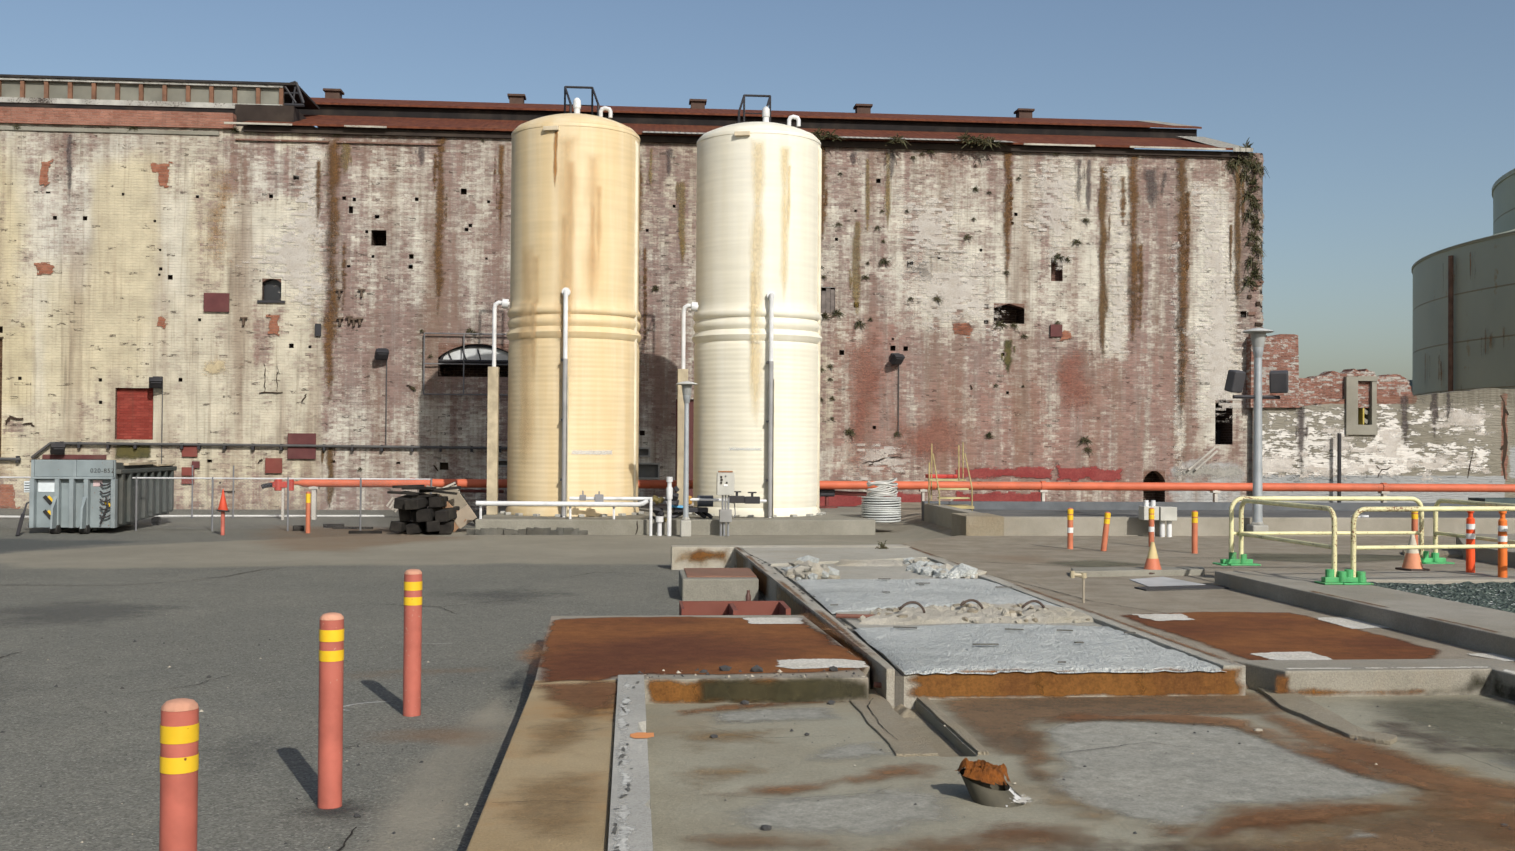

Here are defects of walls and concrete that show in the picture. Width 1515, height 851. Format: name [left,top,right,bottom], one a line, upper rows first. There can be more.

water stain [246,146,329,315]
water stain [1020,160,1131,358]
water stain [1171,183,1245,469]
peeling [1262,426,1491,481]
peeling [1431,405,1500,435]
corrosion [523,547,882,713]
corrosion [910,585,1515,799]
corrosion [1207,804,1392,835]